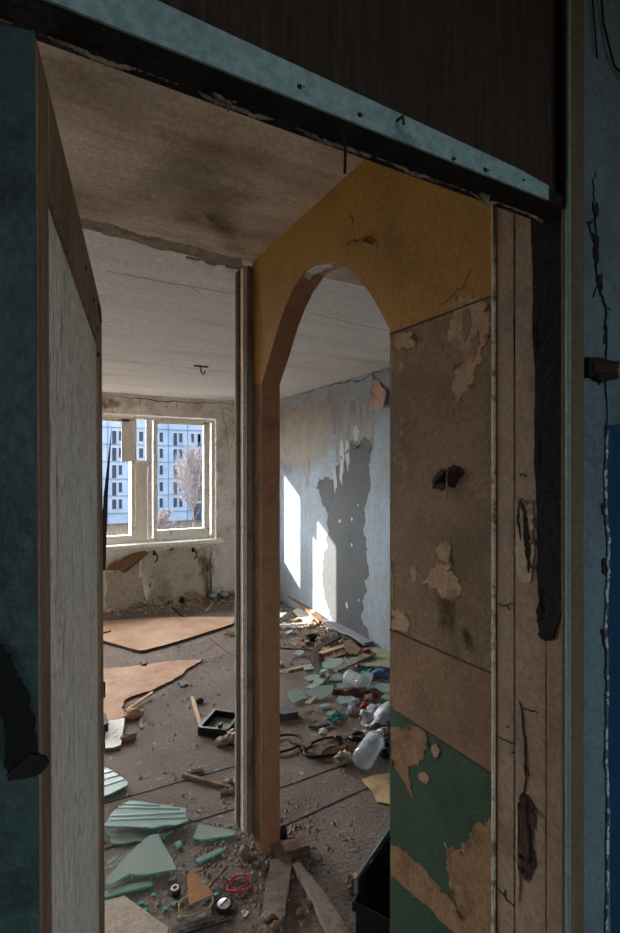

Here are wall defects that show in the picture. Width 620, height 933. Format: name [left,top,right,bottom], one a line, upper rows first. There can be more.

crack [586,171,610,359]
peeling [369,331,416,412]
peeling [447,294,492,403]
crack [602,382,610,431]
peeling [316,425,372,639]
peeling [409,541,463,602]
peeling [390,724,440,799]
crack [497,701,538,796]
peeling [390,817,492,933]